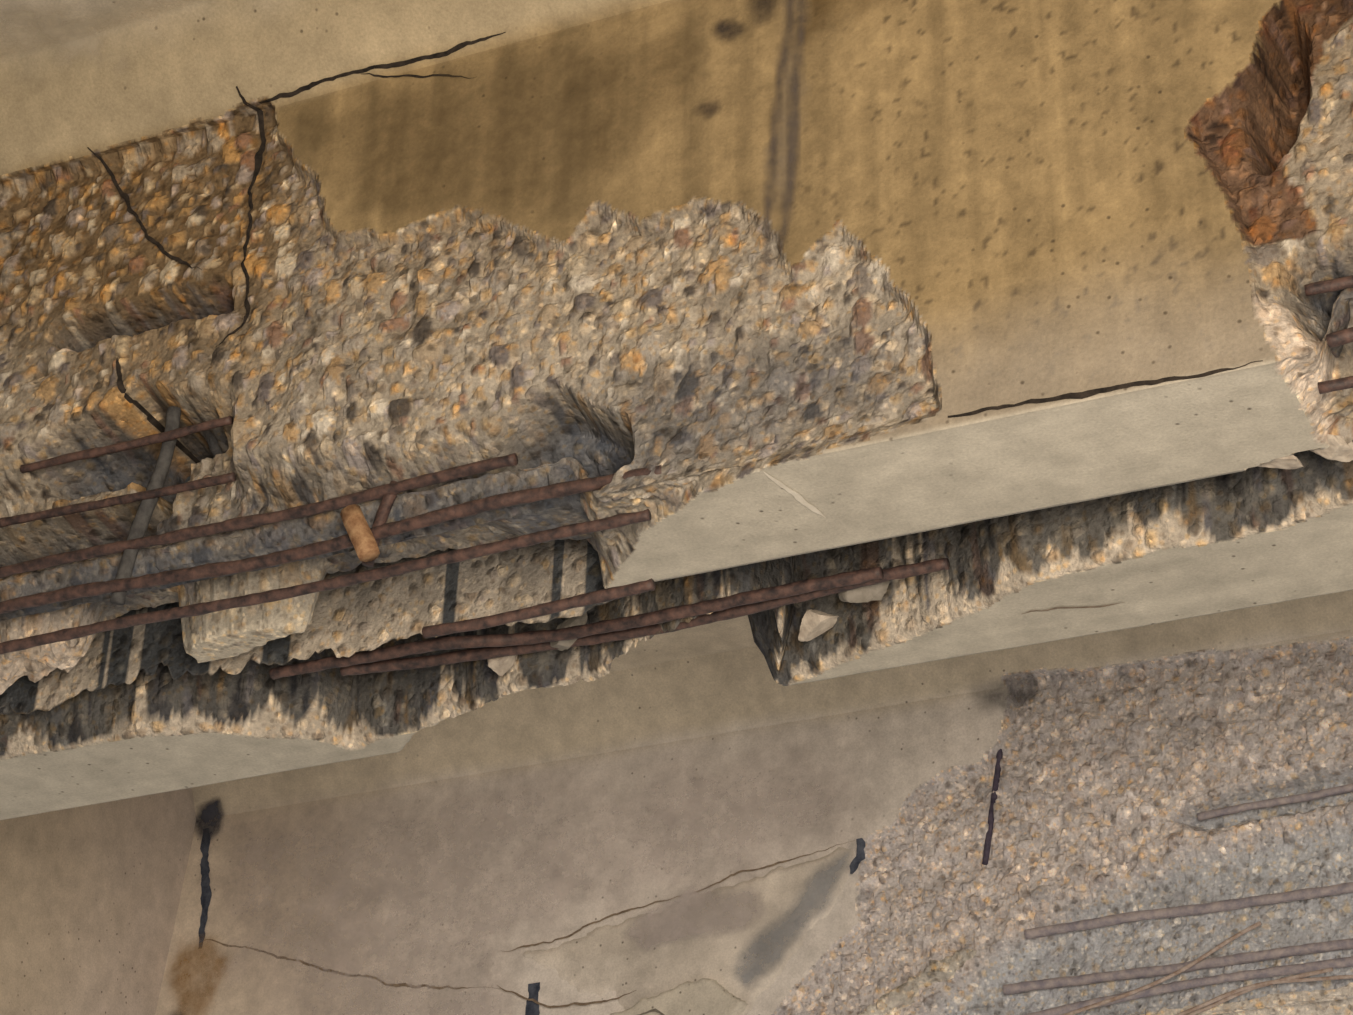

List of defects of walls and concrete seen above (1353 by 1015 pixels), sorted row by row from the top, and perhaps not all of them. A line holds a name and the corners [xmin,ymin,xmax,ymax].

leakage [716,22,741,37]
crack [87,147,202,270]
crack [214,32,506,348]
leakage [771,49,798,201]
crack [116,358,200,463]
spalling [0,0,1353,760]
spalling [505,636,1353,1015]
crack [205,939,636,1008]